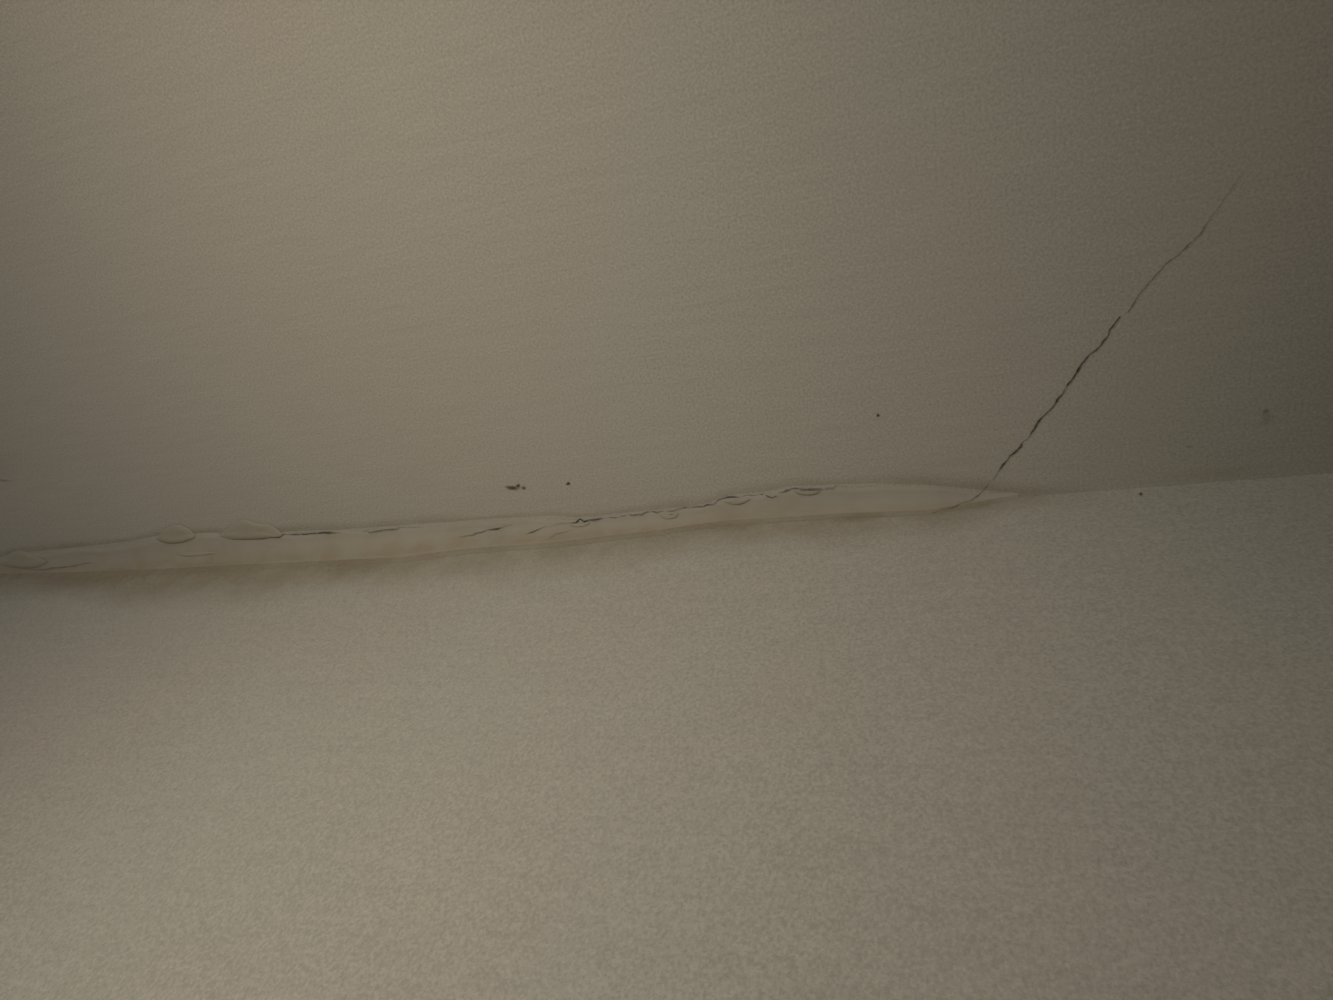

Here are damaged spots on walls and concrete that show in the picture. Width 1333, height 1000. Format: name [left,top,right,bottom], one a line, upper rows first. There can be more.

crack [975,247,1186,498]